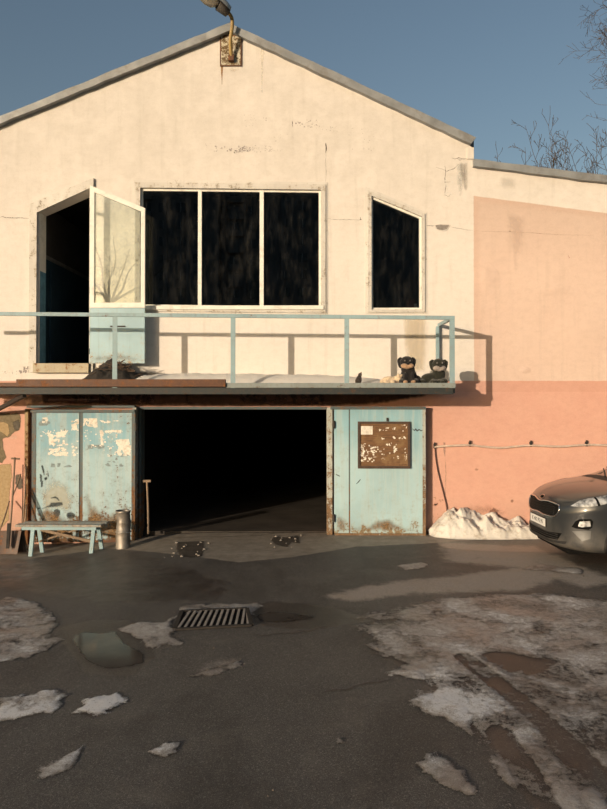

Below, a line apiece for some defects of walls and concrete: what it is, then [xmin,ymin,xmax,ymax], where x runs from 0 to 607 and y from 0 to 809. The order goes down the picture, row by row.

rust [90,510,117,533]